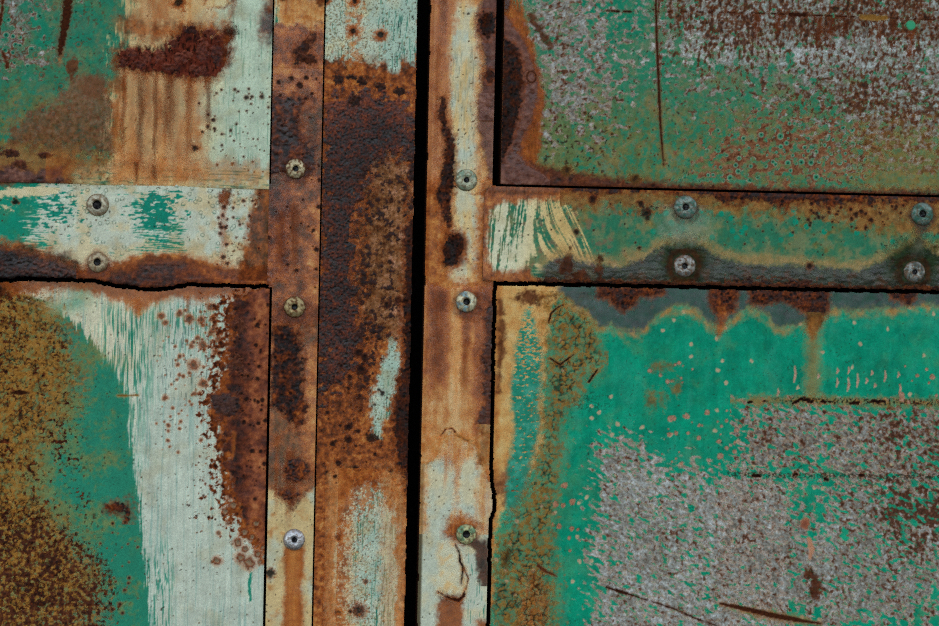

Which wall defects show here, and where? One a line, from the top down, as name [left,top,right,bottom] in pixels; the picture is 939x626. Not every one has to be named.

peeling [521,0,939,191]
peeling [0,187,60,209]
spalling [0,292,131,624]
rust [0,0,417,626]
spalling [155,303,267,453]
spalling [216,192,261,270]
spalling [637,201,666,220]
rust [421,0,939,605]
peeling [552,384,939,626]
spalling [798,202,904,230]